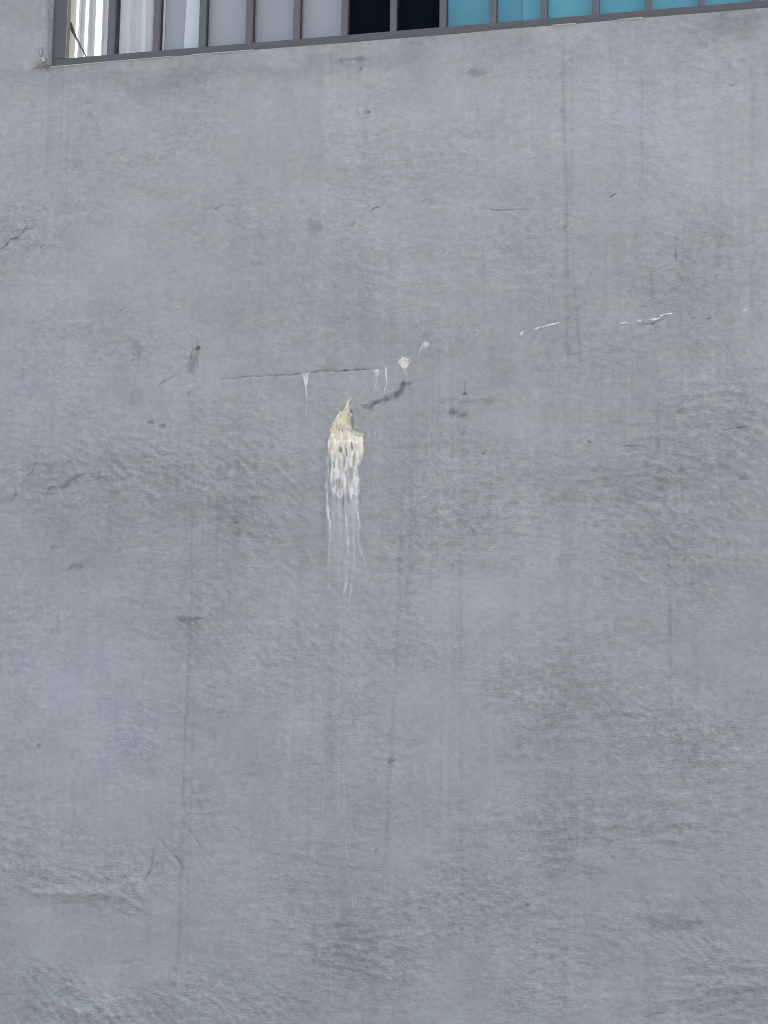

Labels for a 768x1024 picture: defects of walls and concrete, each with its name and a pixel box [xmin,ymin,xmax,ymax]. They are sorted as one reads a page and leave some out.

damp [326,425,376,561]